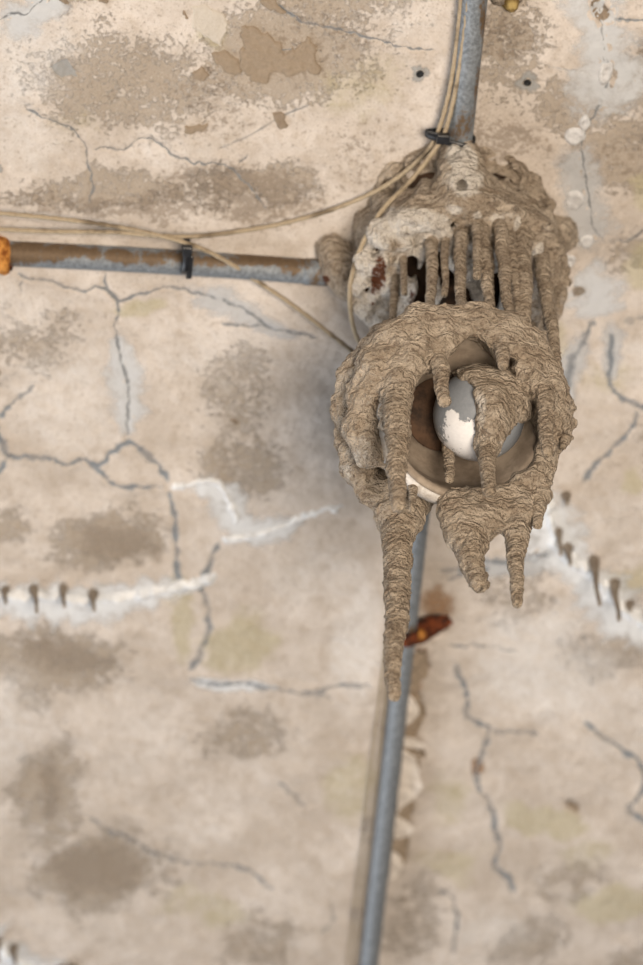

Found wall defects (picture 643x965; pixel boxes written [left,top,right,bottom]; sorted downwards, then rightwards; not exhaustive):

spalling [182,4,321,84]
spalling [260,0,286,14]
crack [277,3,432,50]
crack [28,109,264,205]
crack [584,321,643,480]
crack [0,274,316,690]
efflorescence [0,572,217,627]
efflorescence [484,562,508,576]
efflorescence [524,491,643,646]
crack [456,674,537,892]
crack [584,722,643,822]
efflorescence [0,925,77,965]